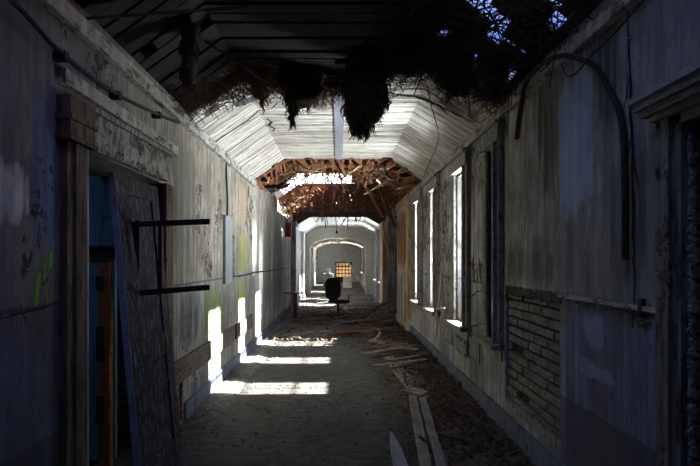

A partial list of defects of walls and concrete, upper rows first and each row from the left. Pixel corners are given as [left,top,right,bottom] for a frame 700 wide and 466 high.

peeling [21,143,54,279]
peeling [96,115,168,181]